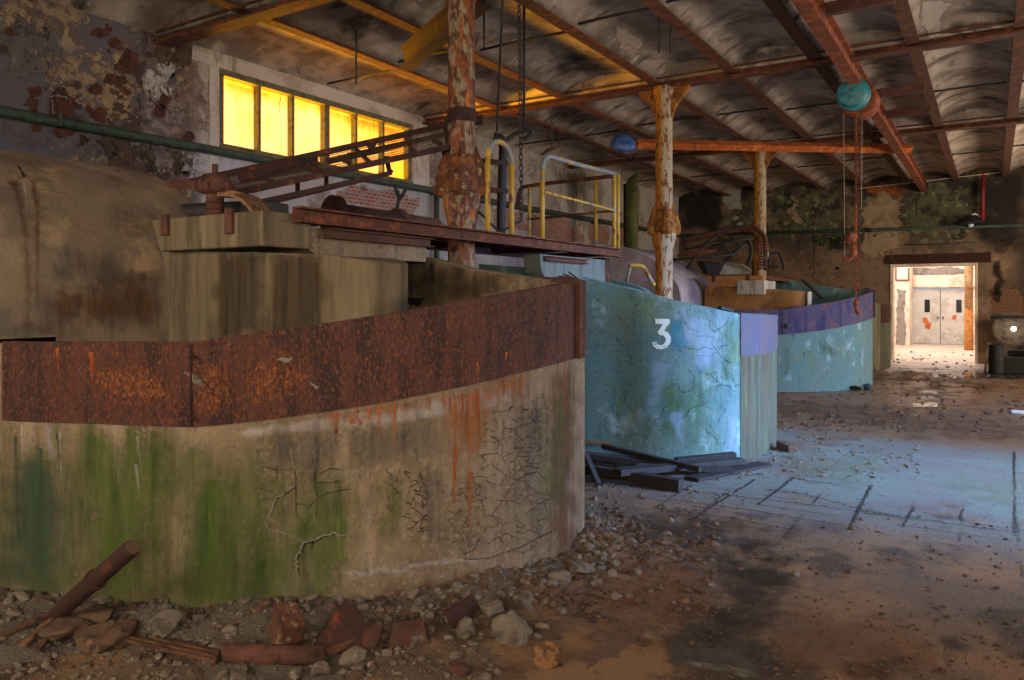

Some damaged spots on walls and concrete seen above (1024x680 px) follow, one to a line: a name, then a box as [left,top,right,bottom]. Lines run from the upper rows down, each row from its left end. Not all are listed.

peeling [0,0,259,183]
rust [83,351,169,413]
rust [193,346,312,414]
crack [259,445,359,575]
crack [383,394,553,560]
rust [444,374,522,519]
crack [585,295,737,452]
crack [663,451,1017,534]